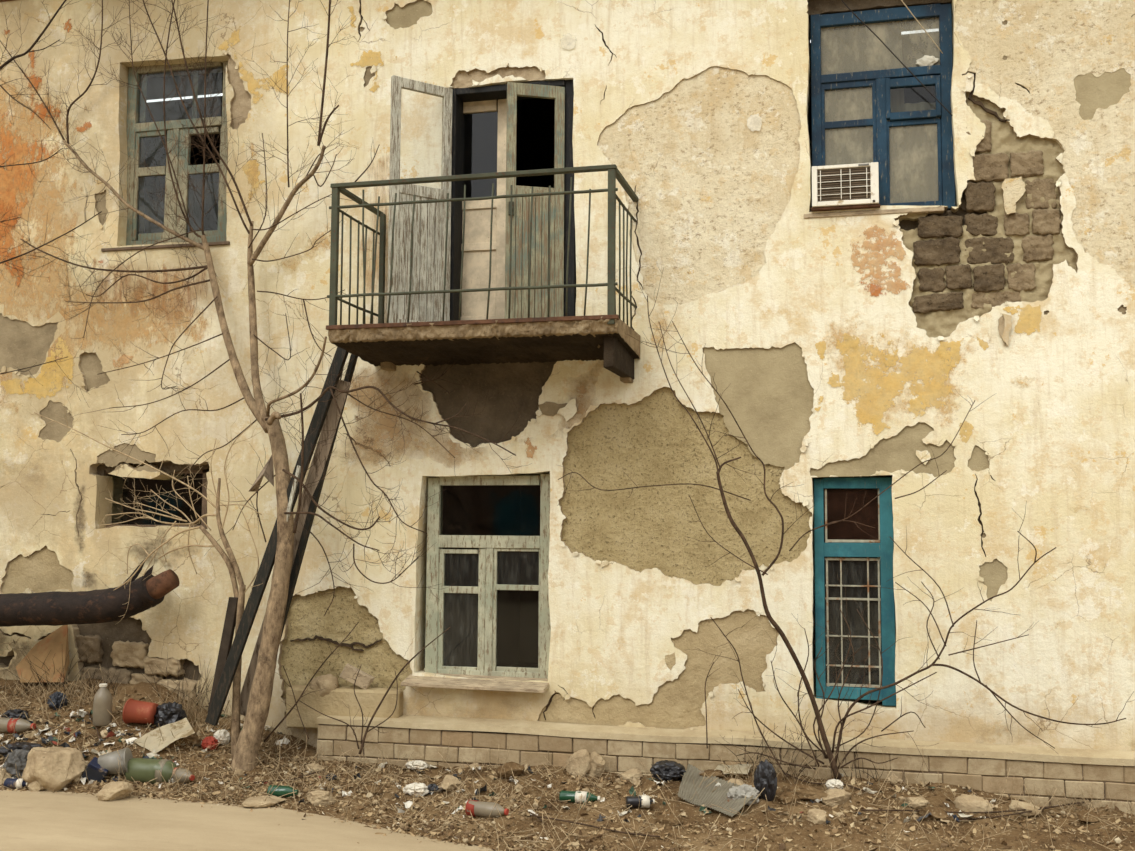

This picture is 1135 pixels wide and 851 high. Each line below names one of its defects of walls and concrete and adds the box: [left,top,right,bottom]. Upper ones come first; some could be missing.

flaking render [382,0,433,29]
peeling [0,50,207,442]
flaking render [420,0,1135,586]
flaking render [2,546,74,594]
crack [974,475,995,557]
flaking render [978,559,1007,601]
flaking render [280,582,412,698]
flaking render [538,609,779,730]